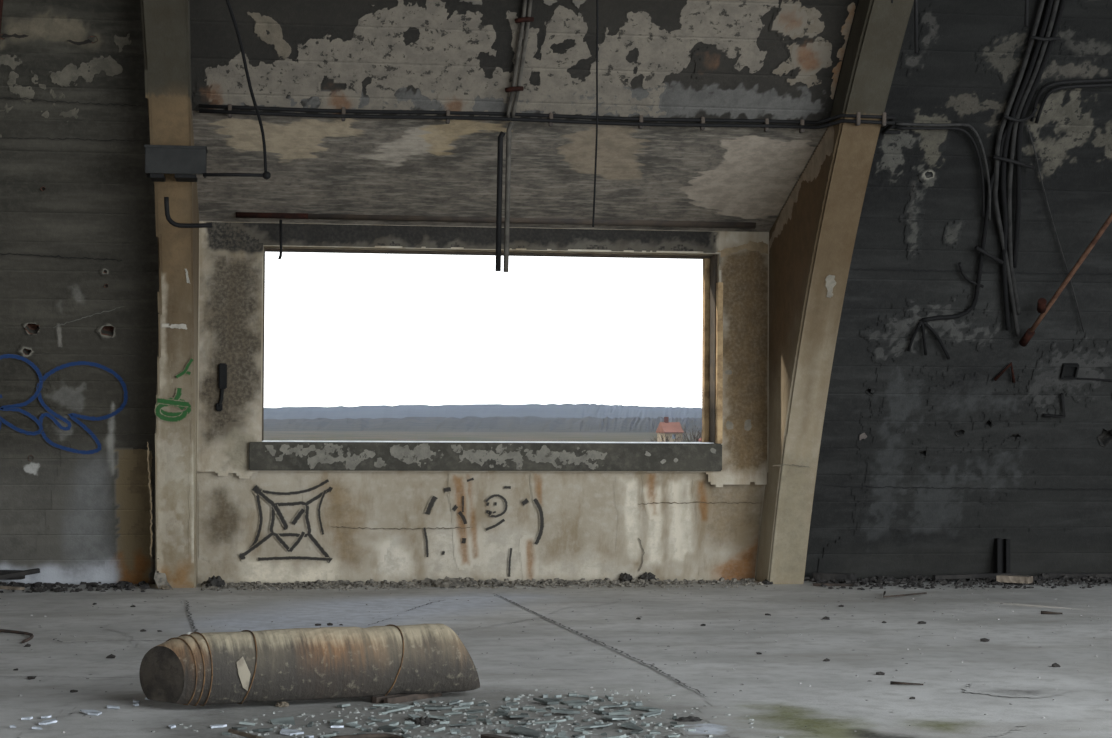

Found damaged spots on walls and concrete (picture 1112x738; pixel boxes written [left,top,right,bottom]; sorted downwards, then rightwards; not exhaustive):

spalling [0,0,133,123]
peeling [202,0,857,258]
peeling [872,21,1112,260]
peeling [127,267,194,590]
peeling [210,422,619,479]
peeling [644,450,678,465]
rust [530,473,548,510]
rust [447,473,484,570]
rust [105,541,194,588]
rust [519,535,540,582]
rust [699,524,760,580]